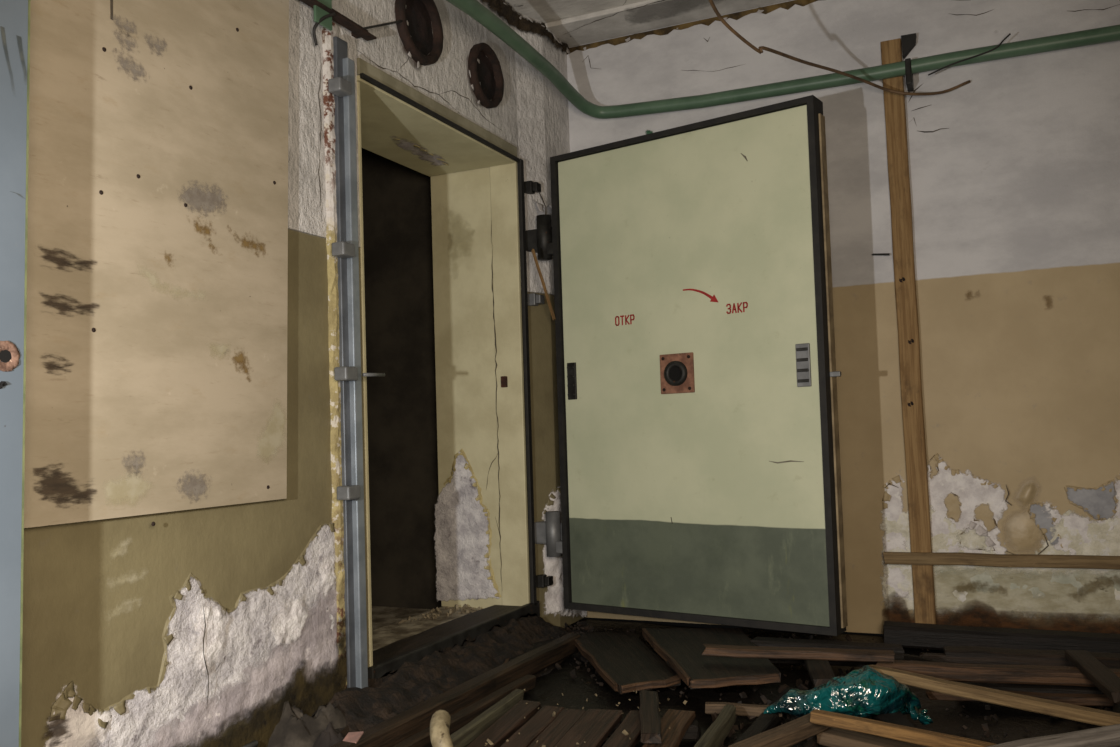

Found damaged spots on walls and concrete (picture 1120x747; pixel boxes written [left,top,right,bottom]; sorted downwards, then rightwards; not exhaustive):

water stain [181,185,224,215]
peeling [434,449,502,601]
peeling [882,475,909,598]
water stain [880,510,914,611]
peeling [927,453,1008,554]
water stain [930,505,1120,620]
spalling [1028,475,1120,555]
peeling [45,522,339,747]